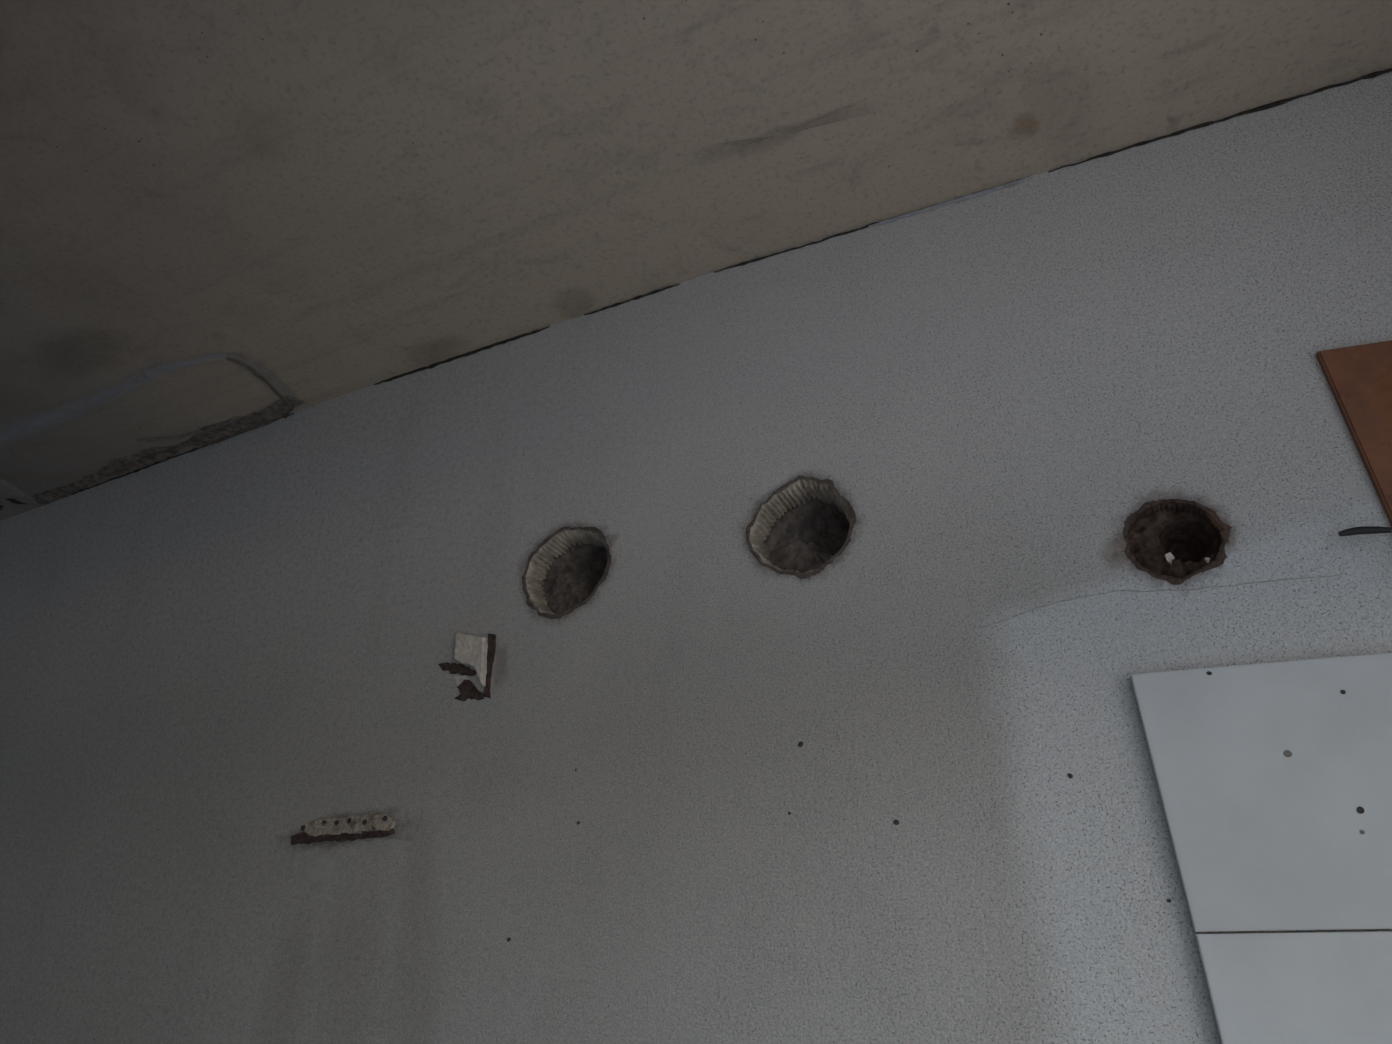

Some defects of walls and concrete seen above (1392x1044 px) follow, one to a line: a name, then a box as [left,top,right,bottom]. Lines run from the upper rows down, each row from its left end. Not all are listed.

spalling [0,356,305,521]